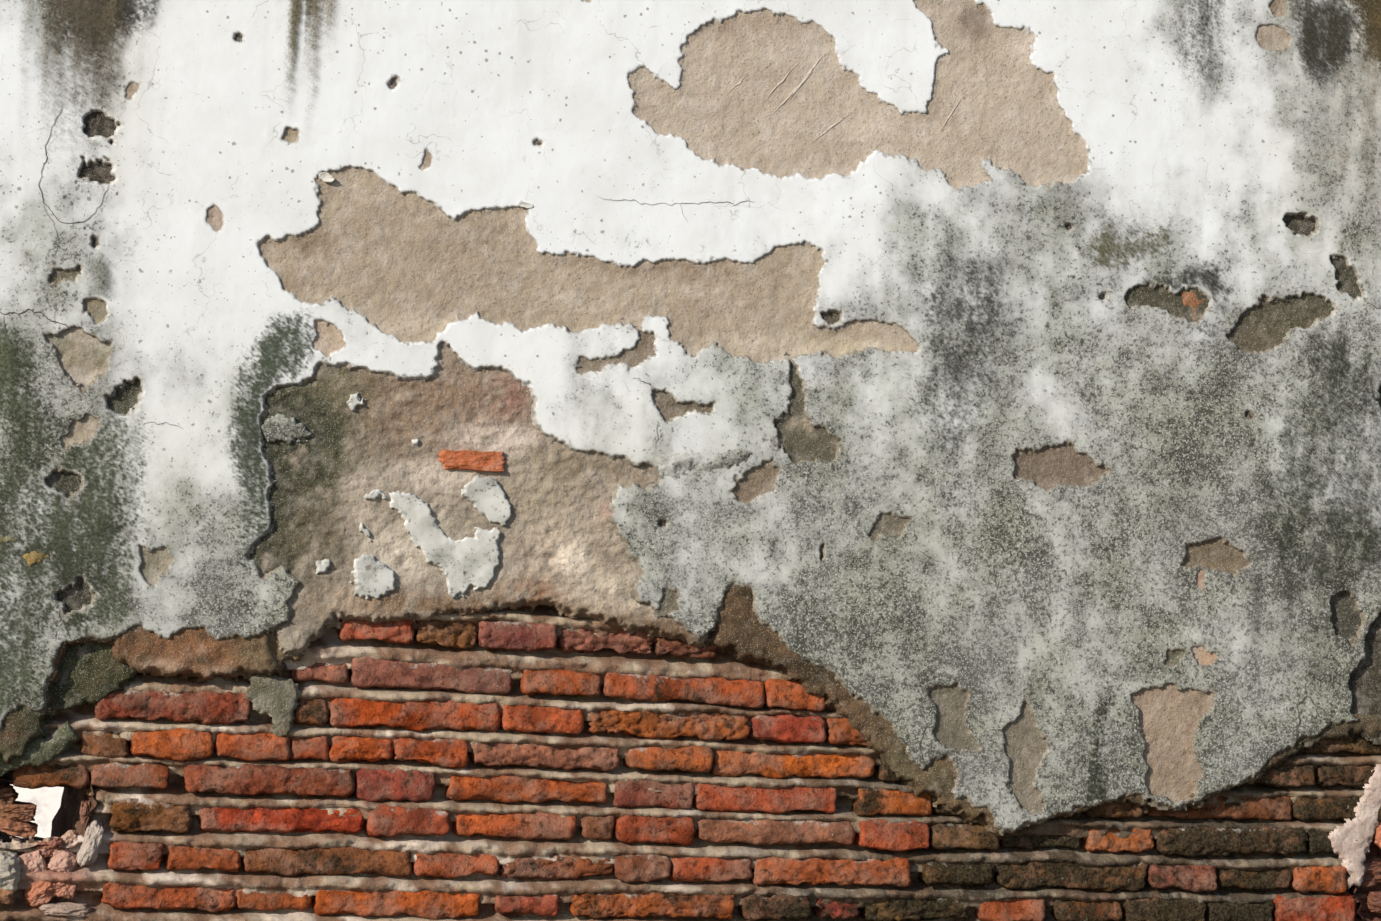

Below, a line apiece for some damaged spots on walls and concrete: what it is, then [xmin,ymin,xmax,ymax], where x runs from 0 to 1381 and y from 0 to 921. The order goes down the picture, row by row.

leakage [42,0,156,95]
leakage [289,0,333,76]
peeling [628,0,1088,189]
leakage [1293,0,1381,85]
spalling [250,167,919,655]
leakage [909,260,1010,450]
leakage [1157,263,1233,308]
peeling [1226,256,1361,353]
leakage [1255,331,1381,593]
spalling [1330,591,1381,744]
spalling [0,778,106,917]
spalling [1328,764,1381,921]